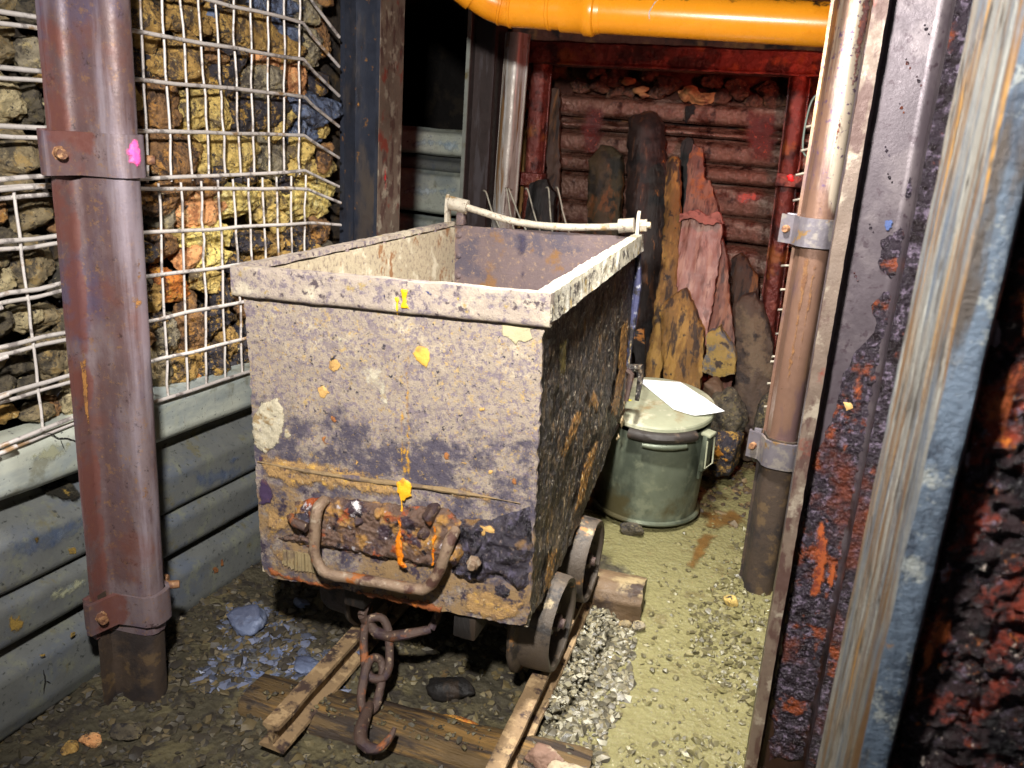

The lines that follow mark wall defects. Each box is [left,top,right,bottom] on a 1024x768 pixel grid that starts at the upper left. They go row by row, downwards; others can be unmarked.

rust [80,359,89,431]
rust [810,523,836,597]